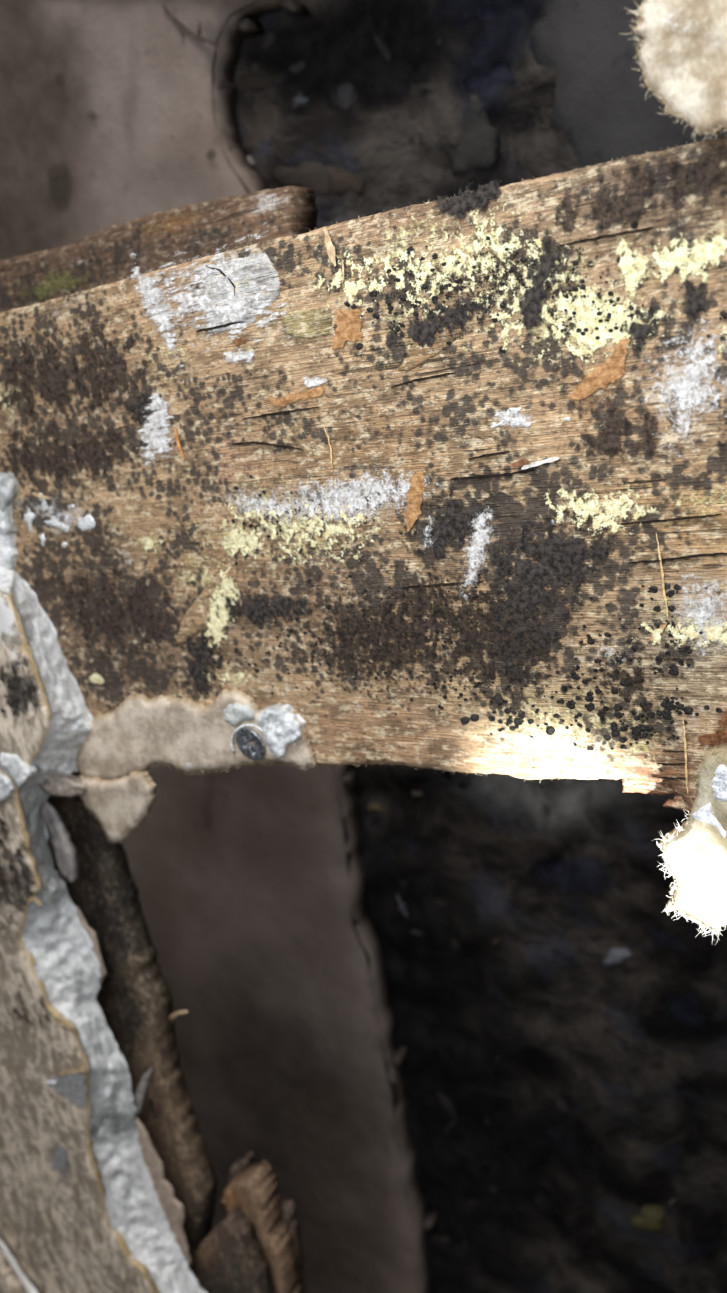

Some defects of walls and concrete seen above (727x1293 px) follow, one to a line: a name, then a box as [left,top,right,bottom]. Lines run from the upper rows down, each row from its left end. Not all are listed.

water stain [312,142,727,364]
water stain [0,324,170,489]
water stain [576,391,680,464]
water stain [0,661,38,717]
water stain [32,475,727,751]